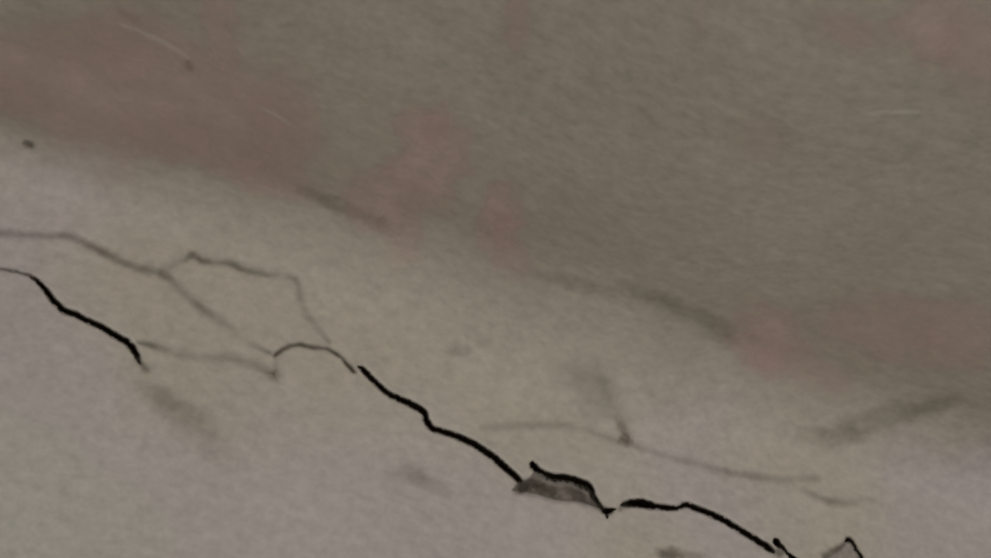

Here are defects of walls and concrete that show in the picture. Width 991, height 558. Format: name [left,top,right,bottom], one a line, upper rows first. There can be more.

crack [9,270,141,365]
crack [274,343,524,483]
crack [620,498,797,558]